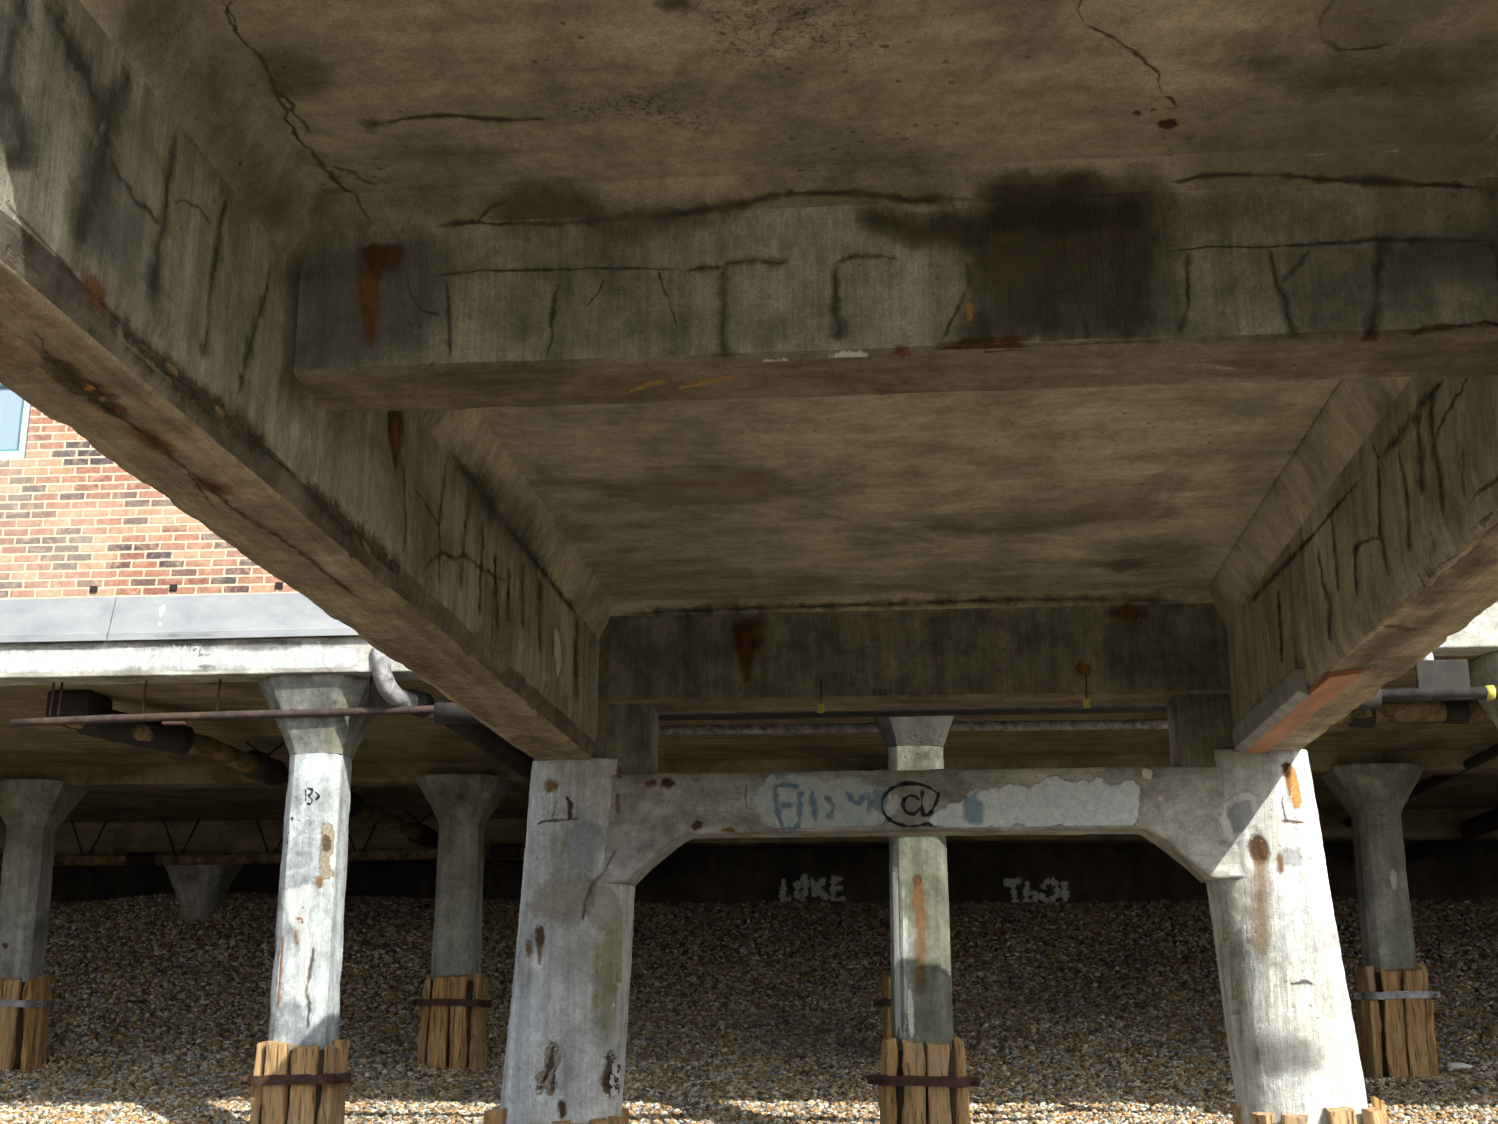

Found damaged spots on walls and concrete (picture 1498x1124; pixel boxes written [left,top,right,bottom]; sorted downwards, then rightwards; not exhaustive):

crack [0,0,291,473]
rust [358,245,405,345]
crack [446,190,943,226]
damp [863,176,1158,340]
crack [1179,237,1498,337]
crack [403,456,579,681]
crack [1252,378,1498,661]
peeling [964,796,982,822]
rust [277,906,304,1008]
rust [913,874,925,987]
rust [1248,834,1284,948]
spalling [535,1041,562,1096]